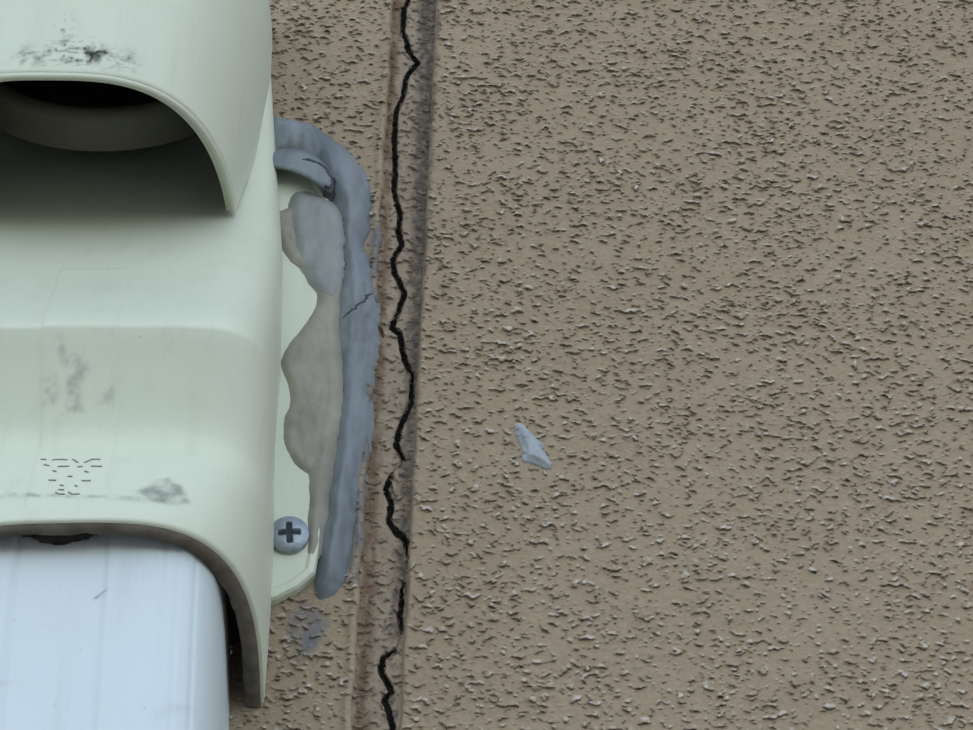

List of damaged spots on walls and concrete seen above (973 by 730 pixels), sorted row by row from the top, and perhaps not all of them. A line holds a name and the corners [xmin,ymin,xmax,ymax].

crack [378,0,420,730]